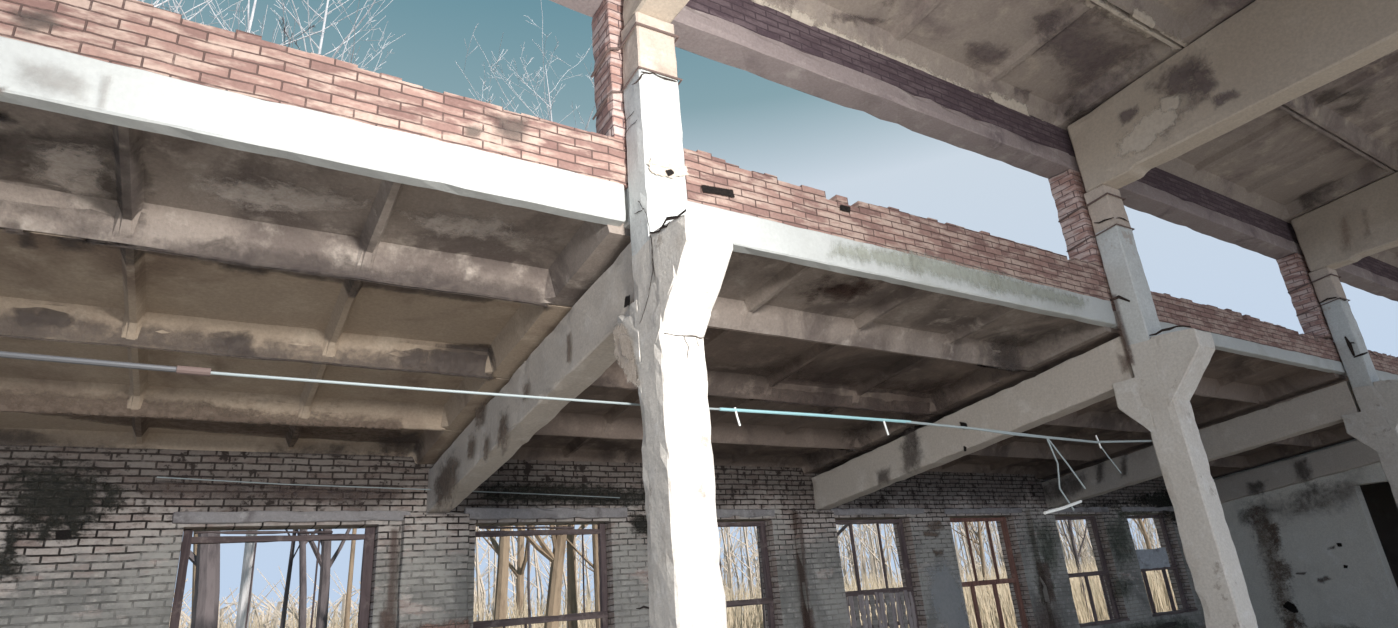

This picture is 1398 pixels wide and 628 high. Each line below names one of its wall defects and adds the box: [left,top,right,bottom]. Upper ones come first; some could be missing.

water stain [0,114,143,220]
water stain [1036,9,1146,124]
spalling [1118,94,1182,156]
water stain [1156,60,1238,106]
water stain [7,224,33,248]
crack [635,201,708,357]
spalling [613,322,640,386]
water stain [0,391,419,581]
water stain [1243,482,1302,628]
flaking render [406,617,471,628]